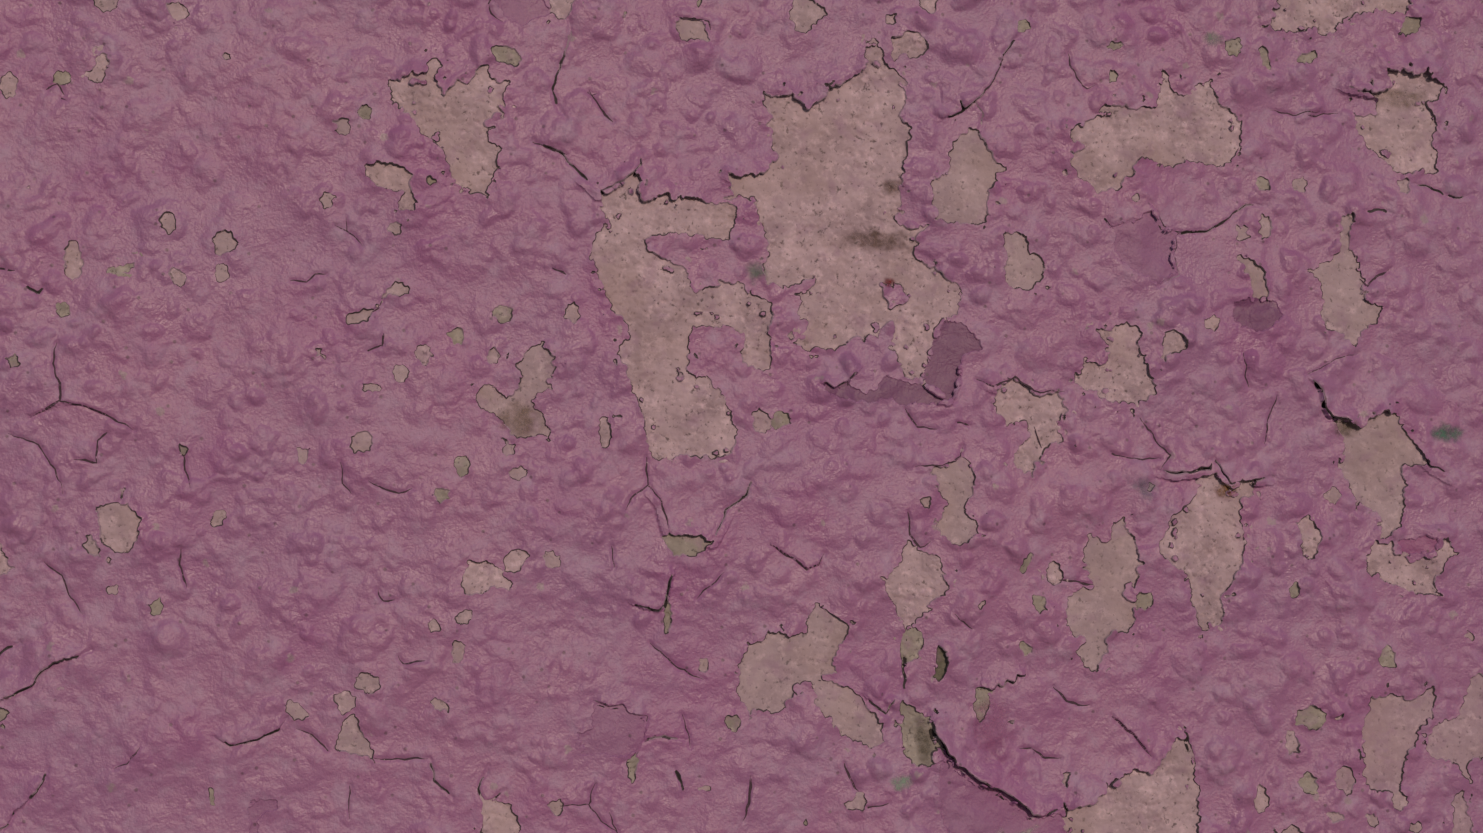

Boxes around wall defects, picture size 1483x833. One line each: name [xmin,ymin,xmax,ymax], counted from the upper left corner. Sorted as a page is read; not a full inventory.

peeling [365,46,521,234]
peeling [574,14,1006,463]
crack [935,33,1012,118]
peeling [1062,71,1241,283]
peeling [1261,0,1447,193]
peeling [980,322,1188,475]
peeling [645,480,732,556]
peeling [1152,417,1274,638]
peeling [1324,402,1463,597]
crack [0,562,80,699]
peeling [725,603,1200,833]
peeling [1298,674,1483,833]